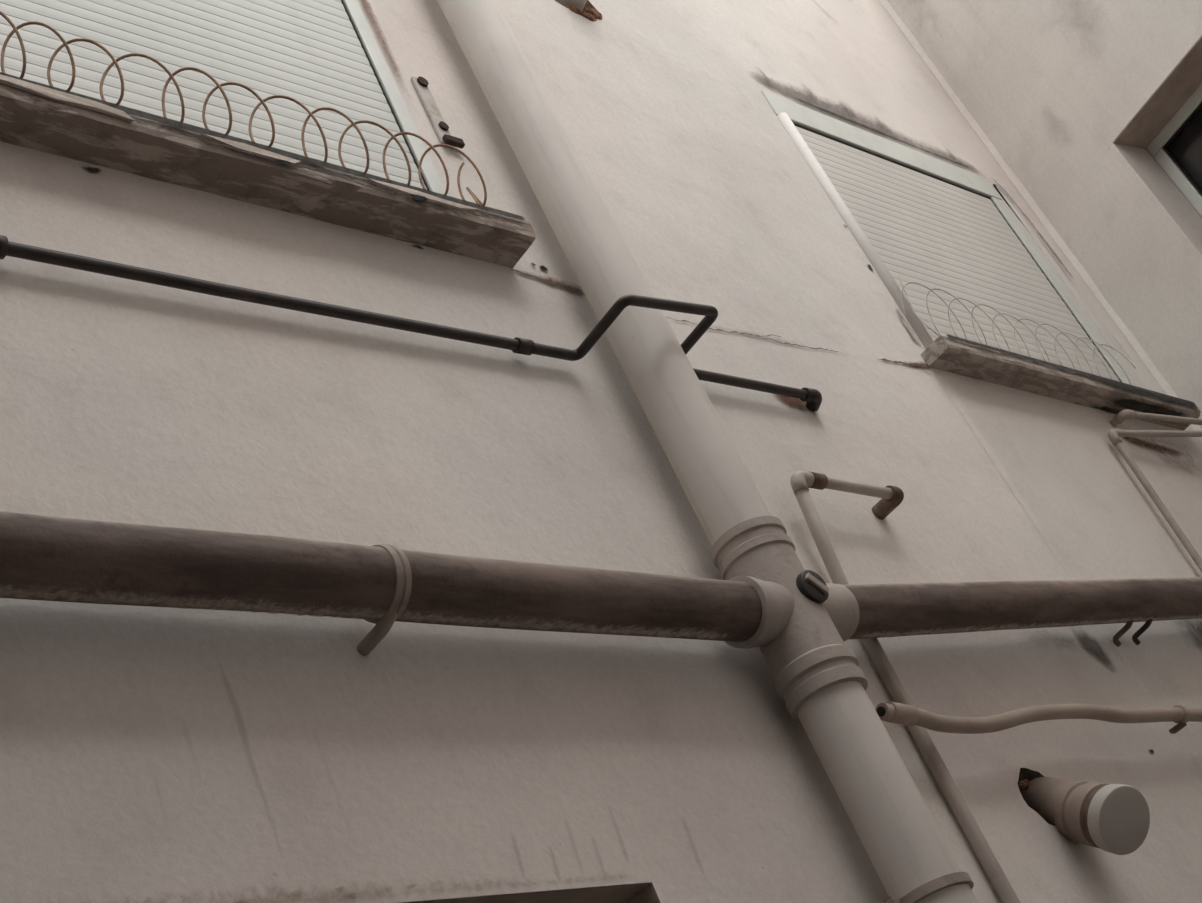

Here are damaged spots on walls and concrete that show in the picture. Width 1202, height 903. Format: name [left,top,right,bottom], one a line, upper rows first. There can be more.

spalling [566,0,603,22]
crack [667,317,838,352]
crack [879,358,932,375]